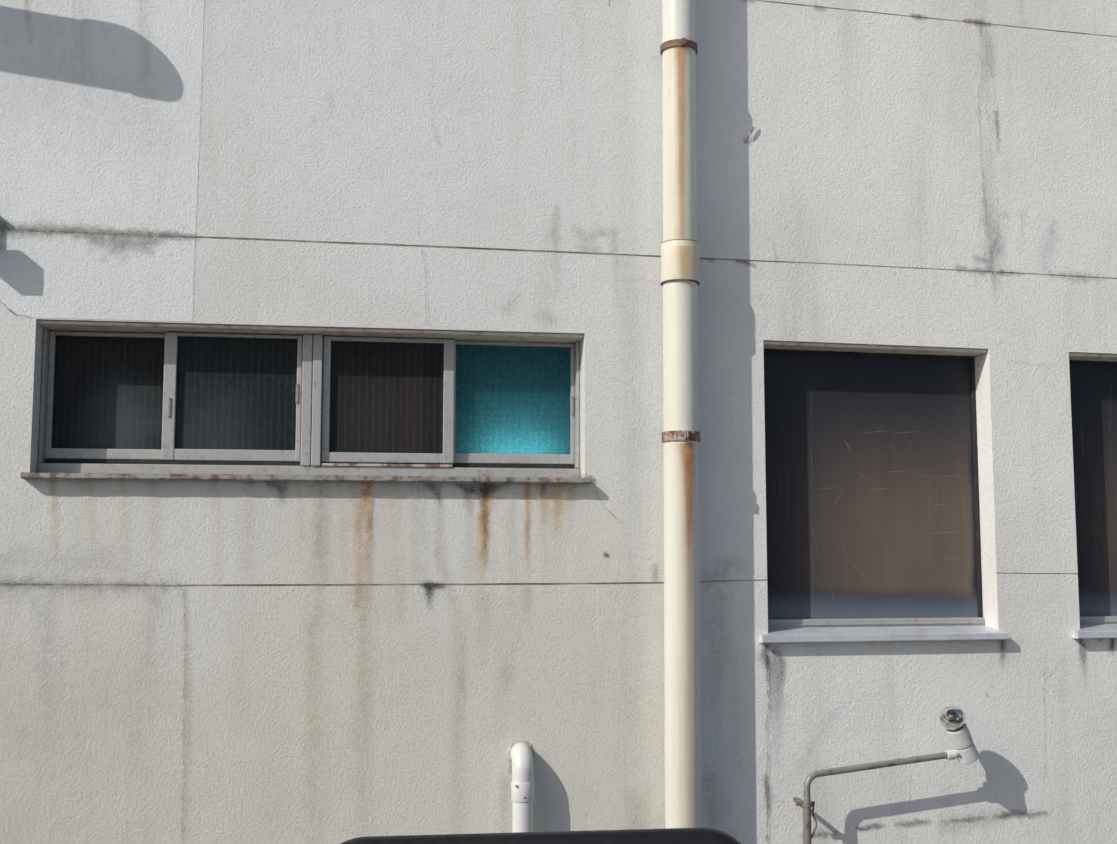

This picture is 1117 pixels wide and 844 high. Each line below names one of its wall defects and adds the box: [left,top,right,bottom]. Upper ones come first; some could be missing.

mould [0,219,191,250]
corrosion [481,475,489,542]
corrosion [684,443,692,541]